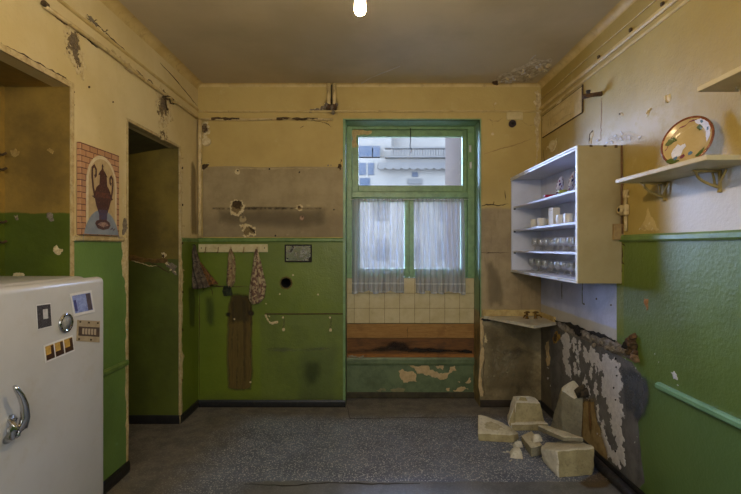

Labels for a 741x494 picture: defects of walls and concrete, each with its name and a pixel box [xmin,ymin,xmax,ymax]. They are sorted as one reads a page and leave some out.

flaking render [63,24,87,81]
peeling [492,58,553,85]
flaking render [155,84,174,142]
flaking render [229,199,245,216]
peeling [376,318,492,396]
peeling [478,319,648,488]